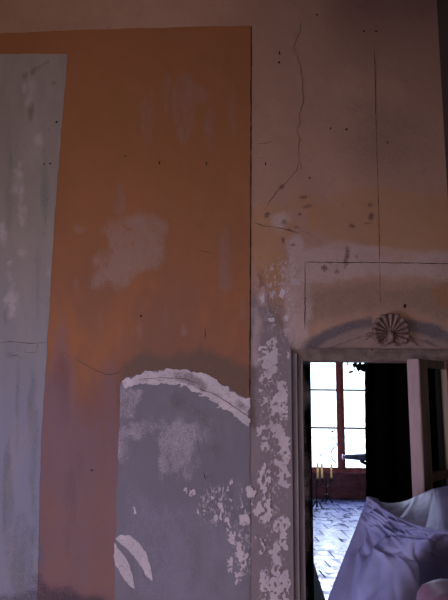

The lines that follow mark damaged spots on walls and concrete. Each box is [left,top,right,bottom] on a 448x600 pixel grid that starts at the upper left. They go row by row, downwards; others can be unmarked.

peeling [122,288,305,600]
leakage [0,180,448,600]